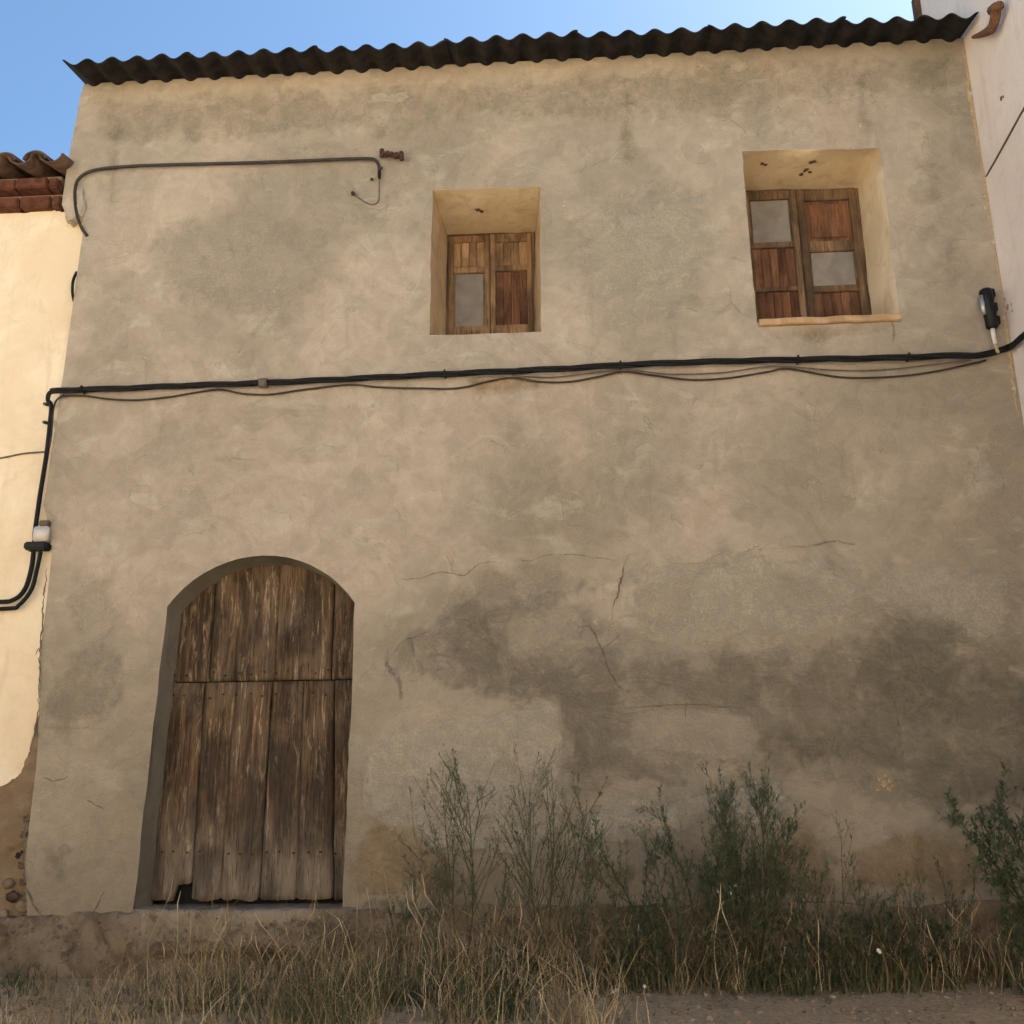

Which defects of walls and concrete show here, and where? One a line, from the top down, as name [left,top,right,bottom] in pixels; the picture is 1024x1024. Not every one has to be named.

crack [548,552,775,717]
damp [635,552,1022,651]
spalling [0,733,38,917]